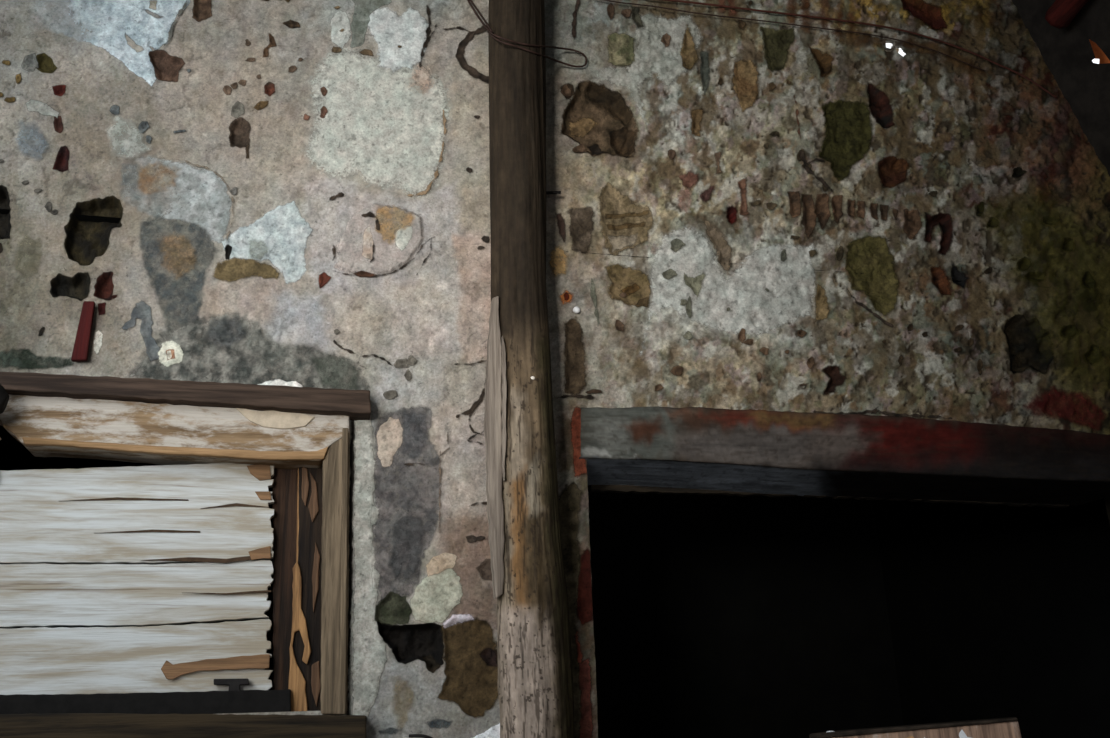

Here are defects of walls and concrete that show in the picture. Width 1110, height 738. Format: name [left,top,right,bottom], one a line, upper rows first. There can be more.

spalling [2,53,66,96]
spalling [138,121,152,143]
spalling [0,185,11,253]
peeling [22,146,279,315]
water stain [130,217,369,390]
crack [332,212,432,277]
water stain [373,407,441,600]
peeling [351,411,498,718]
crack [404,360,487,533]